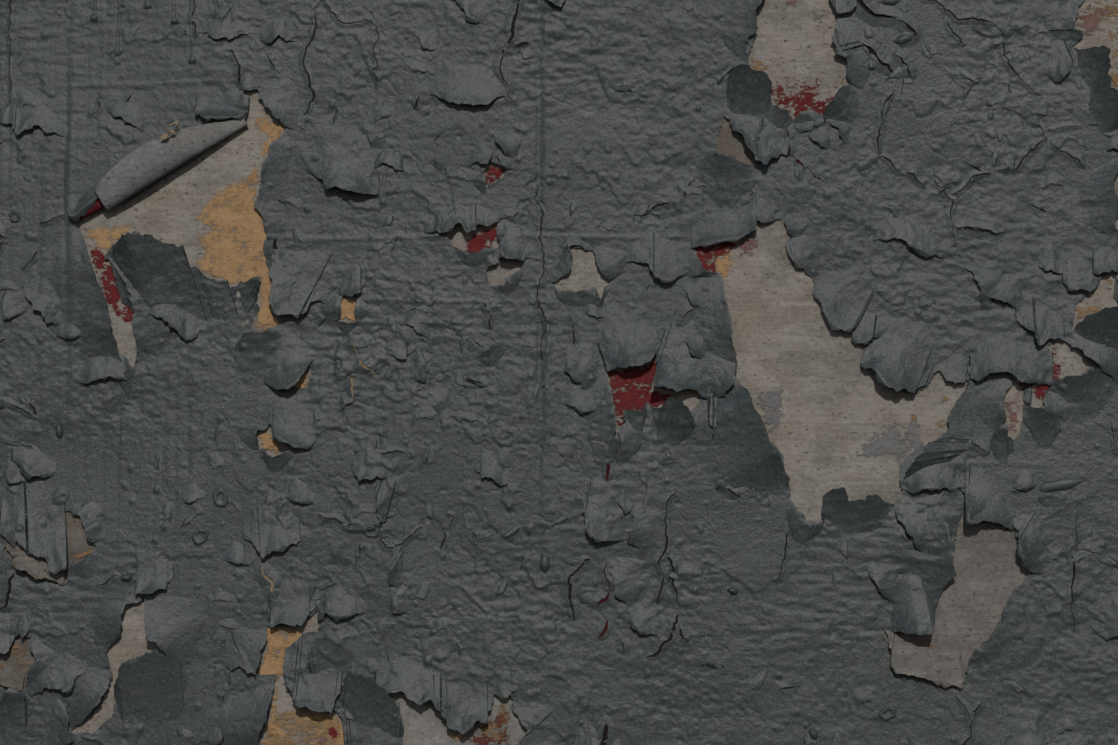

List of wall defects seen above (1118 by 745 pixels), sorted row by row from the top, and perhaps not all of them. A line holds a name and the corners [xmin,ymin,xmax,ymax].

peeling [174,0,256,40]
peeling [0,53,437,474]
peeling [351,432,392,481]
peeling [0,441,106,586]
peeling [223,478,315,565]